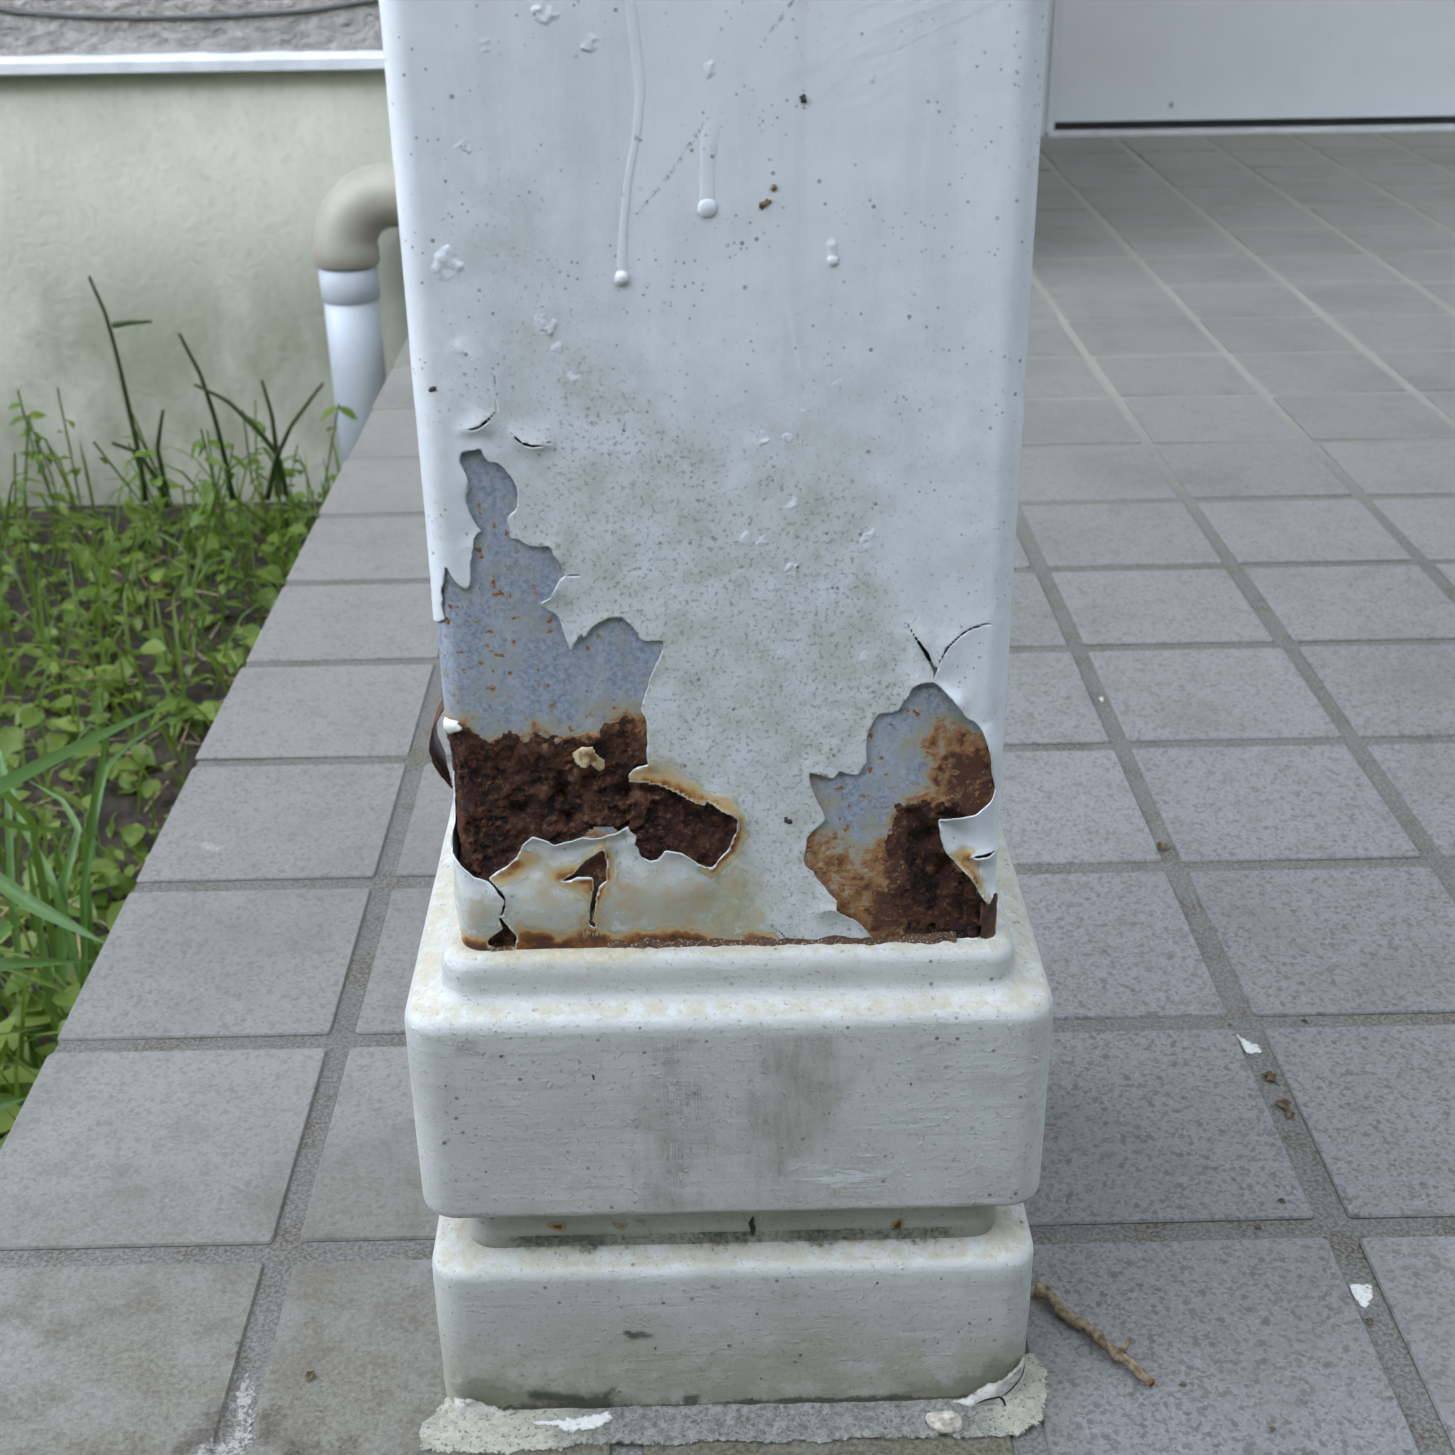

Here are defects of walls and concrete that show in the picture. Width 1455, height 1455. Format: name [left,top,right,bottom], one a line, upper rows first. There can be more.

peeling [429,449,738,947]
crack [908,624,986,661]
corrosion [461,761,956,955]
peeling [804,661,998,939]
corrosion [950,847,991,903]